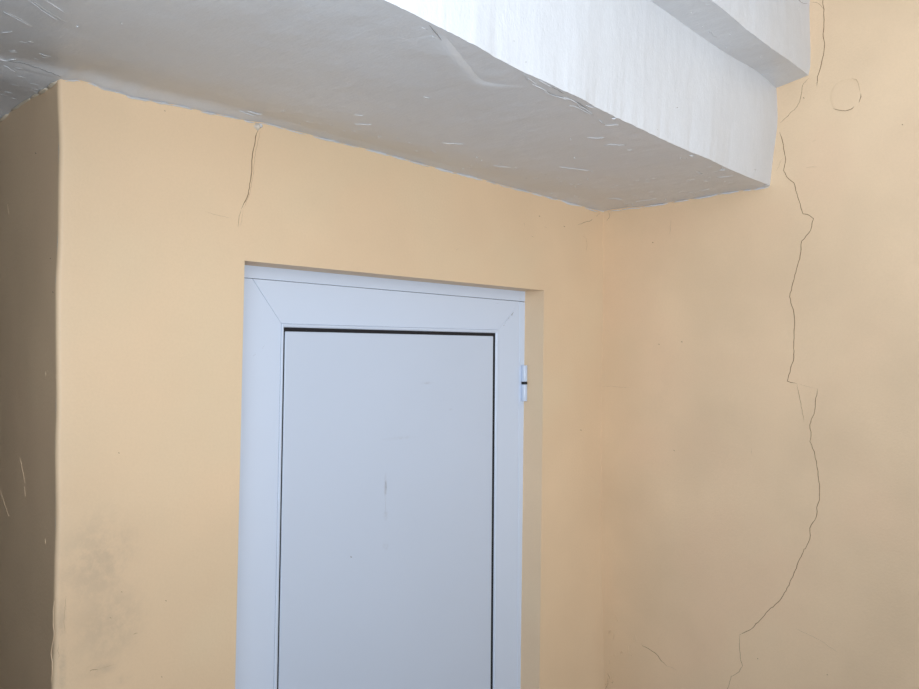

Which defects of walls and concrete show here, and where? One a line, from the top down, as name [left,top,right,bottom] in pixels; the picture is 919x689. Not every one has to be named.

crack [208,131,260,224]
crack [727,0,825,689]